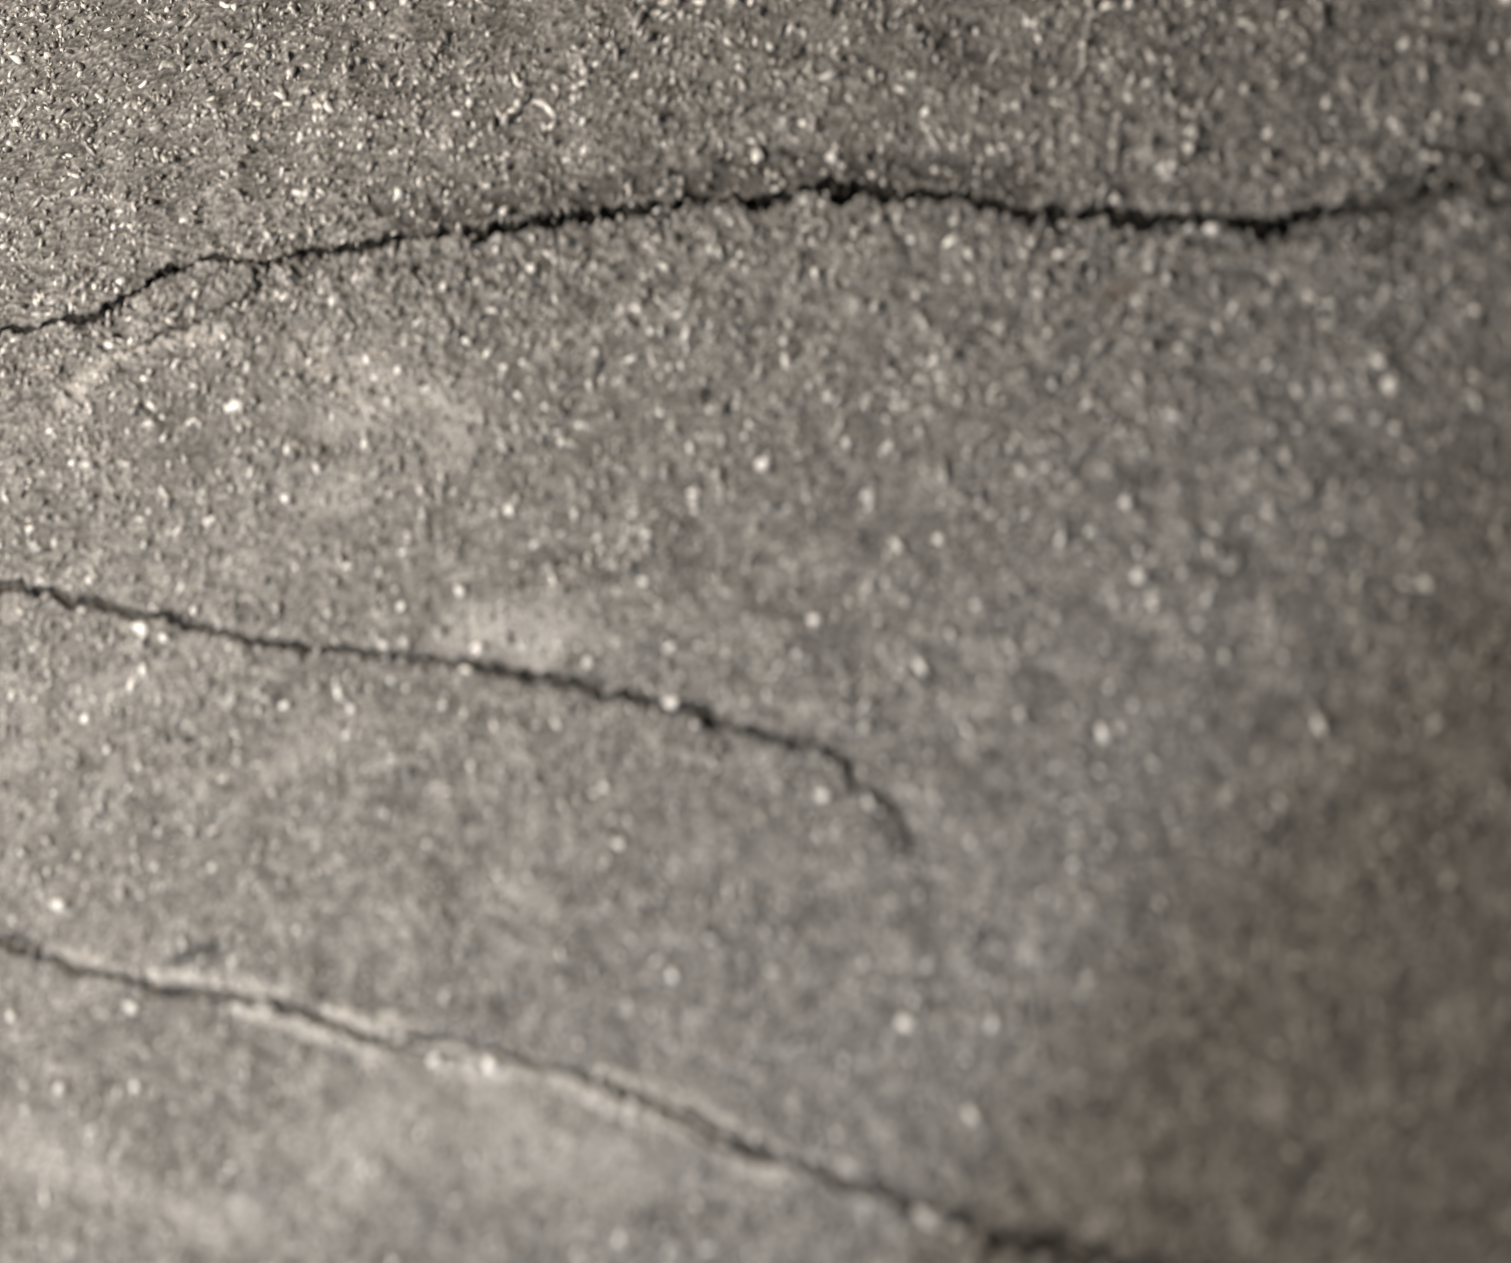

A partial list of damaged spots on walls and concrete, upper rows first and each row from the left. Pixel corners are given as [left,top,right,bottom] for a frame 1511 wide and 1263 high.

crack [0,142,1511,352]
crack [0,577,911,849]
crack [0,926,1161,1263]